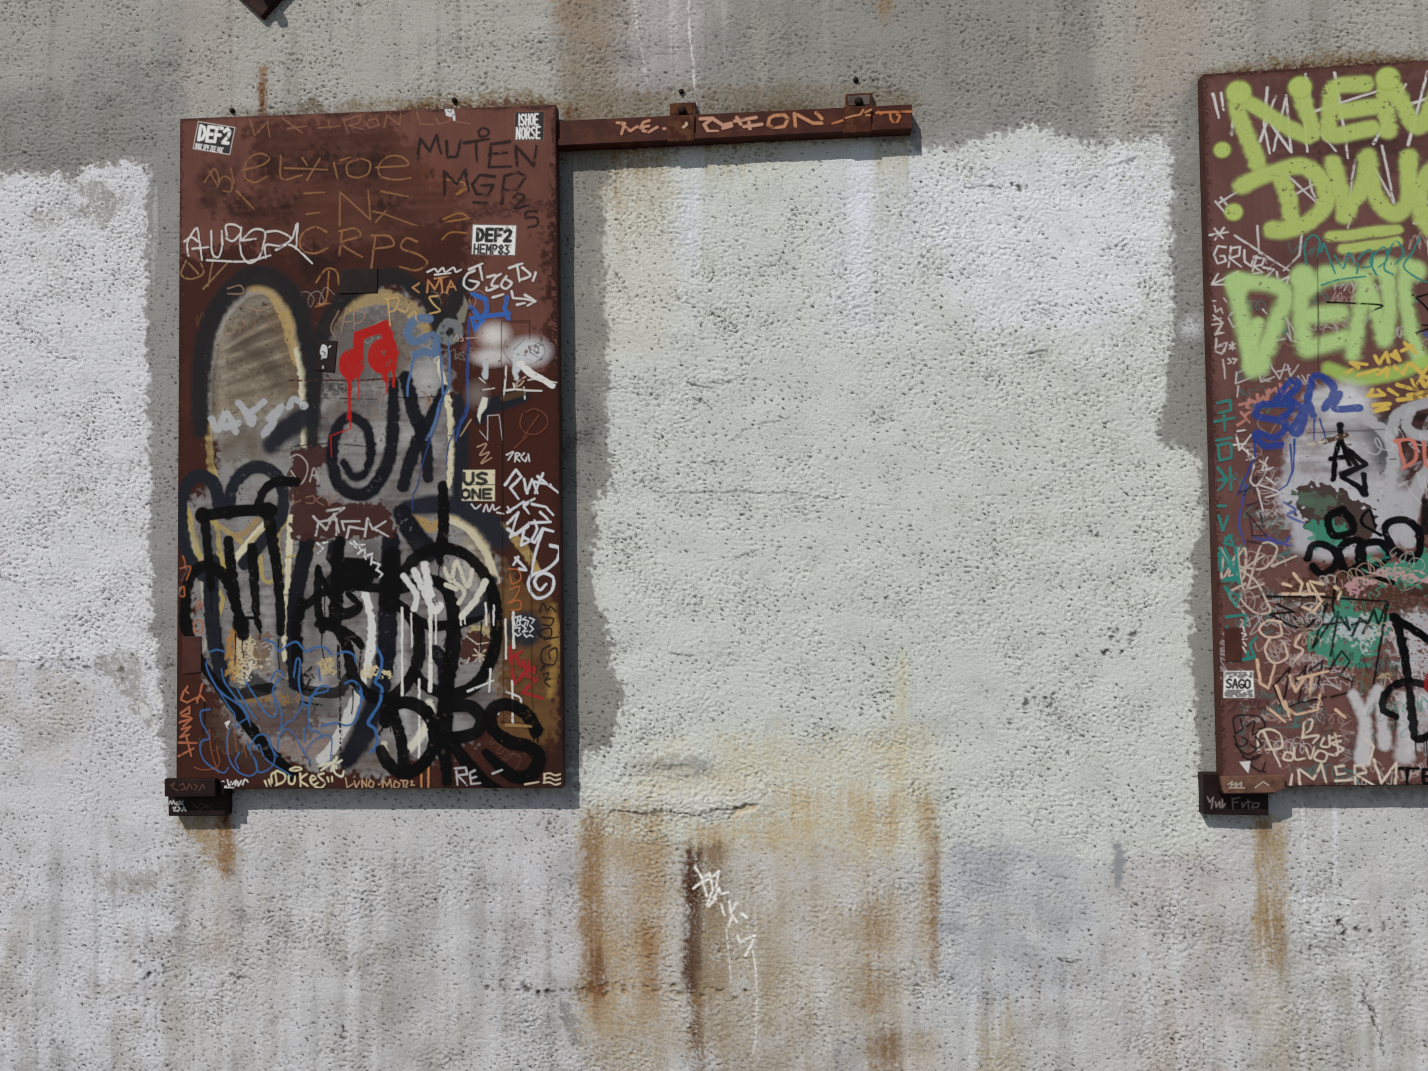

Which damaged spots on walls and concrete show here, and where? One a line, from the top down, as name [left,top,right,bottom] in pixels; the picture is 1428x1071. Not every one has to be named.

rust [217,60,928,247]
rust [559,141,797,276]
rust [163,794,246,1014]
rust [563,643,962,1071]
rust [963,977,1036,1071]
rust [1245,809,1301,1071]